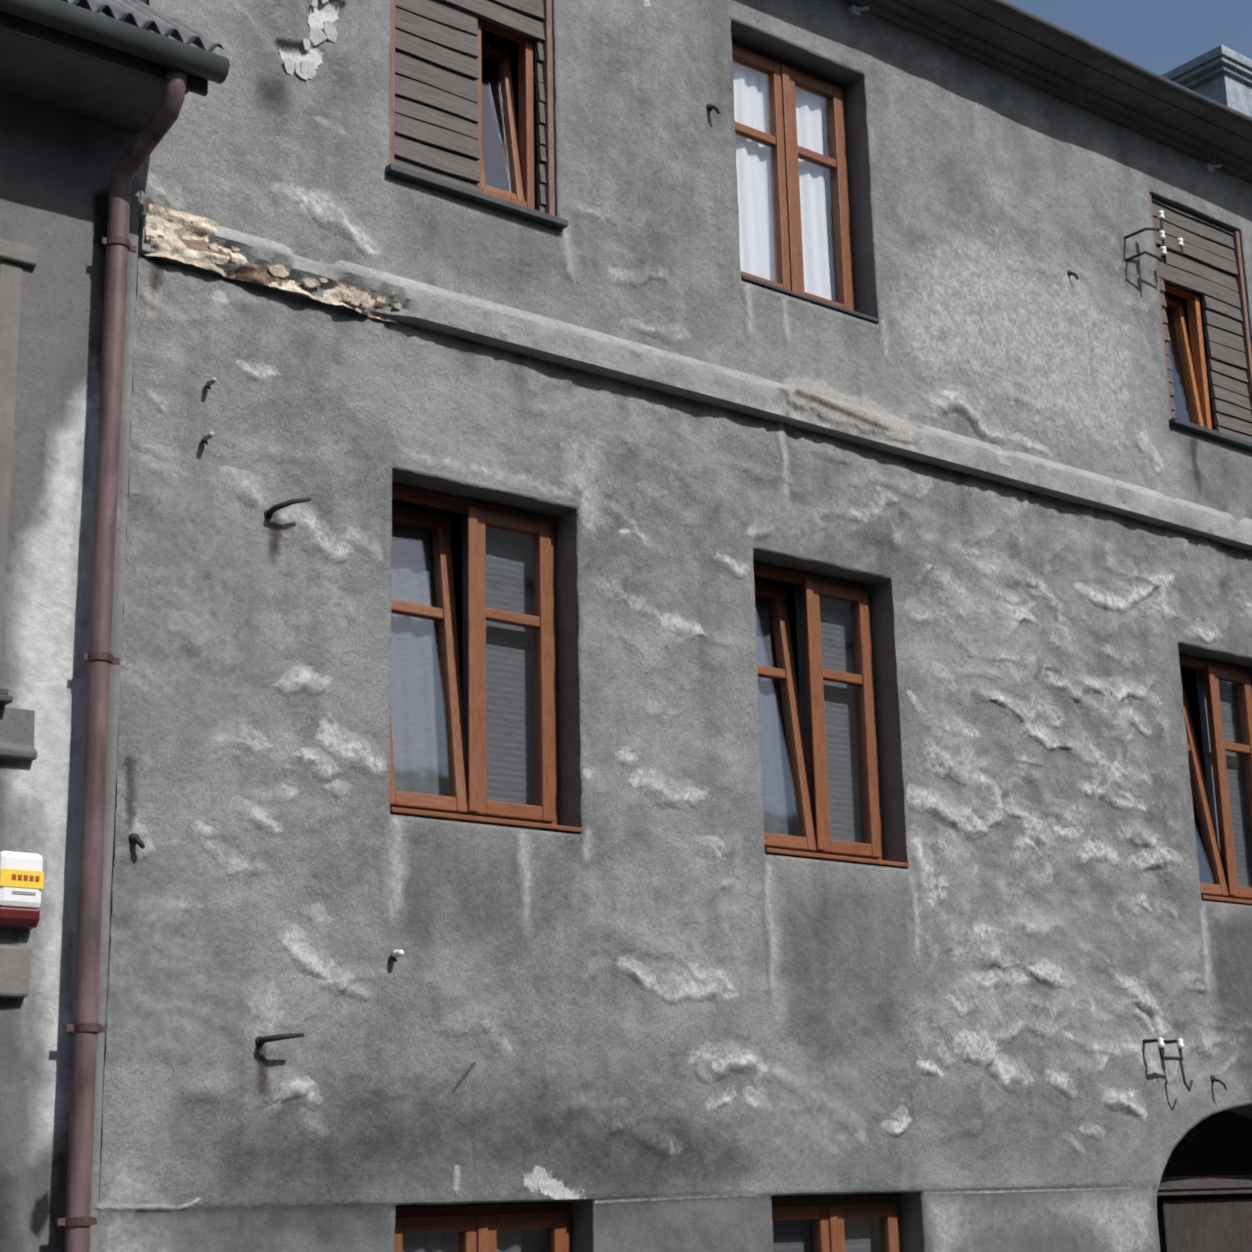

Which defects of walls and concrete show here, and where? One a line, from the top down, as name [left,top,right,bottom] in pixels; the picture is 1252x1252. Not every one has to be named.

spalling [279,0,340,81]
spalling [142,198,402,325]
damp [8,369,100,1252]